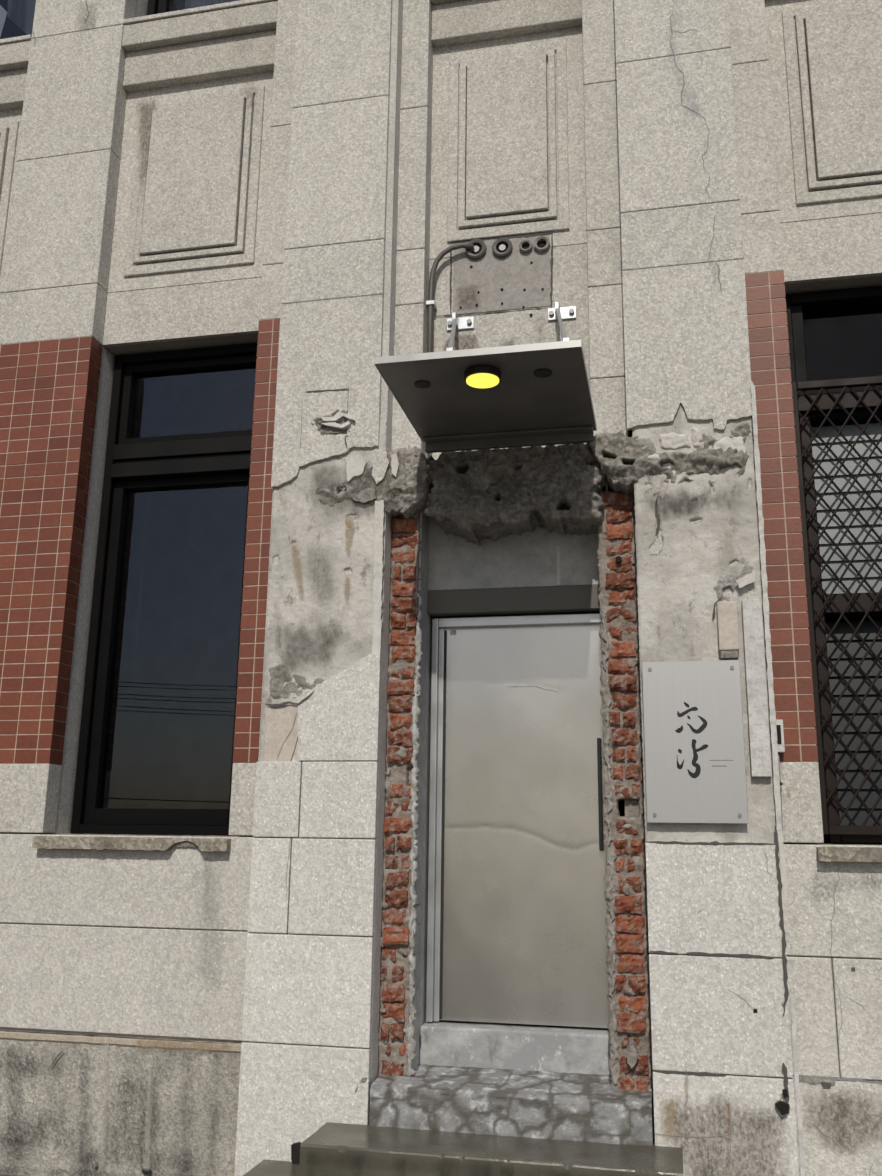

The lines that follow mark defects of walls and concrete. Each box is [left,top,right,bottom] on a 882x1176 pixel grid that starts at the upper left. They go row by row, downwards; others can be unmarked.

crack [670,11,722,292]
spalling [259,389,434,1093]
spalling [590,404,789,1094]
leakage [819,1098,882,1147]